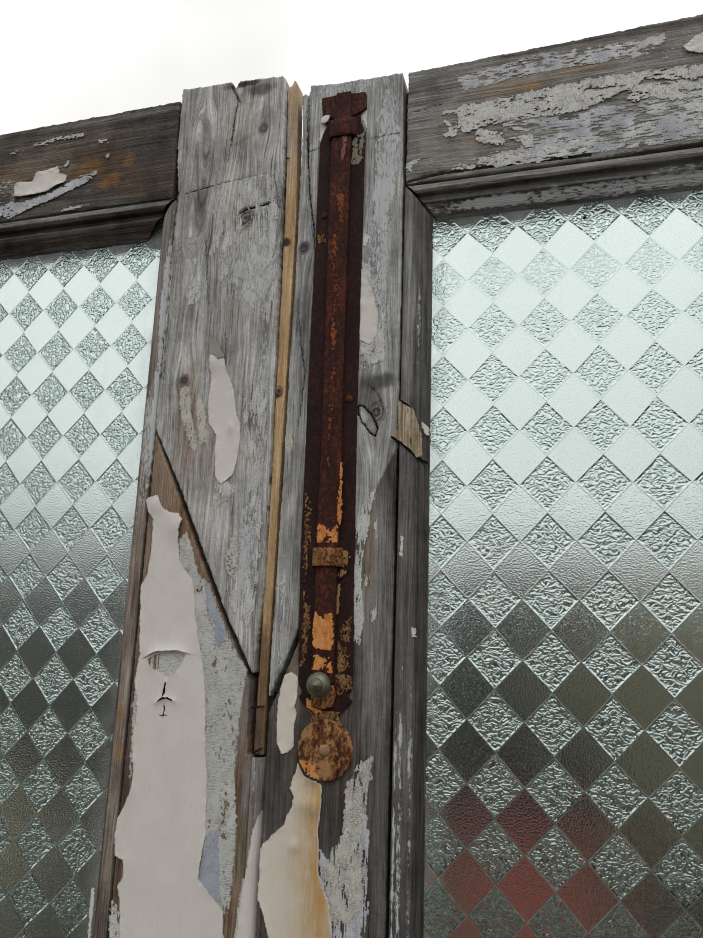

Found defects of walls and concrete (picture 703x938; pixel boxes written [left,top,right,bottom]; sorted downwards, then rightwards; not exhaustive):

peeling [14,166,67,197]
corrosion [341,130,365,165]
peeling [442,32,703,148]
corrosion [317,234,339,350]
peeling [208,337,249,484]
peeling [229,554,257,627]
corrosion [300,457,352,696]
peeling [114,495,224,938]
peeling [276,671,298,754]
peeling [236,760,372,938]